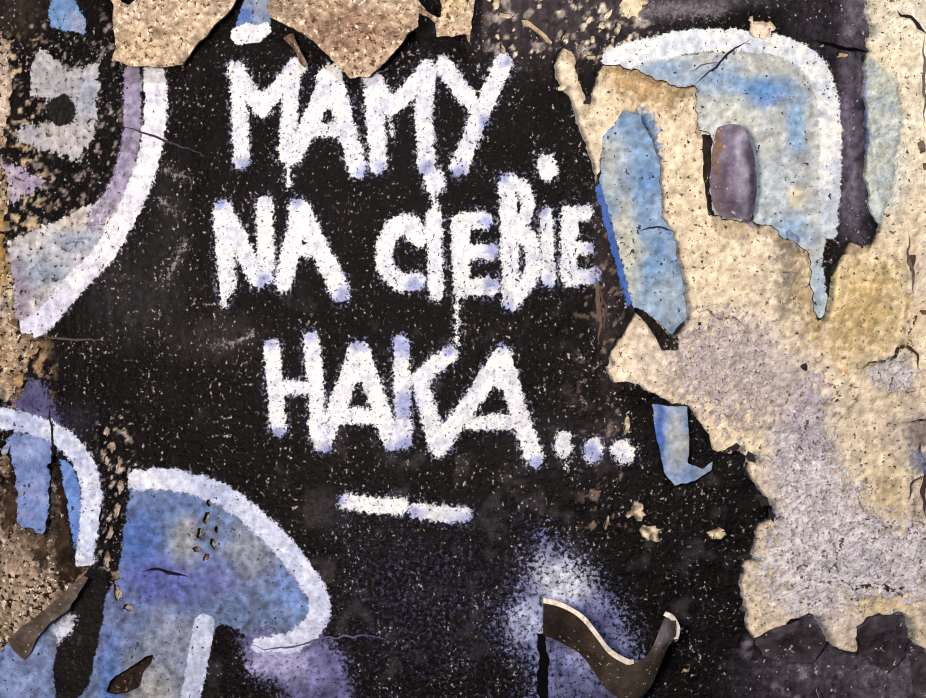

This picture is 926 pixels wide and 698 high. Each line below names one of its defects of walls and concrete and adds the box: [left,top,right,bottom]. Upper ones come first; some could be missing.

peeling [111,0,237,68]
peeling [266,0,476,79]
flaking render [0,29,40,402]
flaking render [543,0,926,698]
flaking render [0,444,91,659]